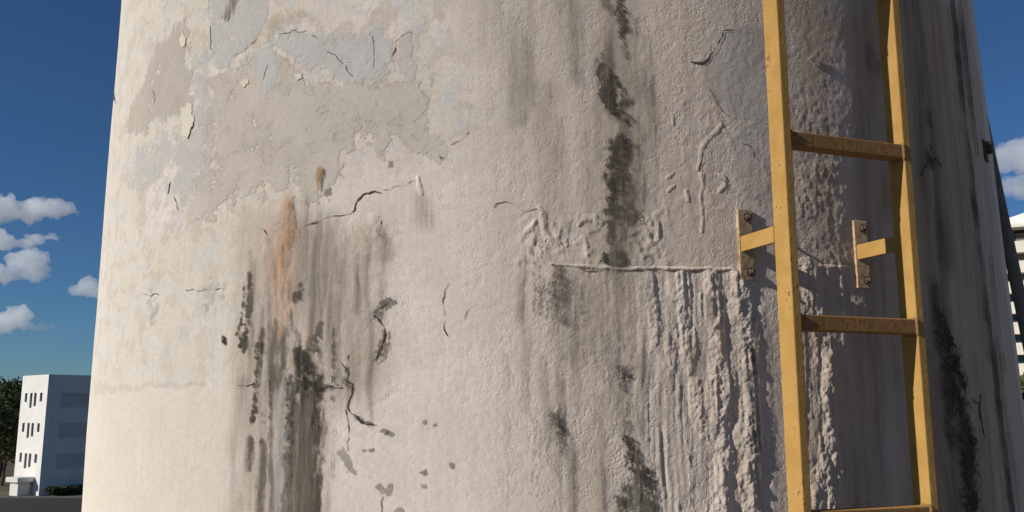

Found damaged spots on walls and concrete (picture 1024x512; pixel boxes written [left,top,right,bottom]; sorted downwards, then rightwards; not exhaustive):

leakage [615,0,631,39]
leakage [221,271,338,512]
peeling [126,0,469,223]
crack [308,297,392,451]
crack [305,180,414,226]
leakage [543,404,573,512]
leakage [549,266,574,325]
leakage [595,47,649,271]
mould [616,365,634,380]
mould [615,420,657,512]
leakage [932,280,982,512]
leakage [952,0,1015,512]